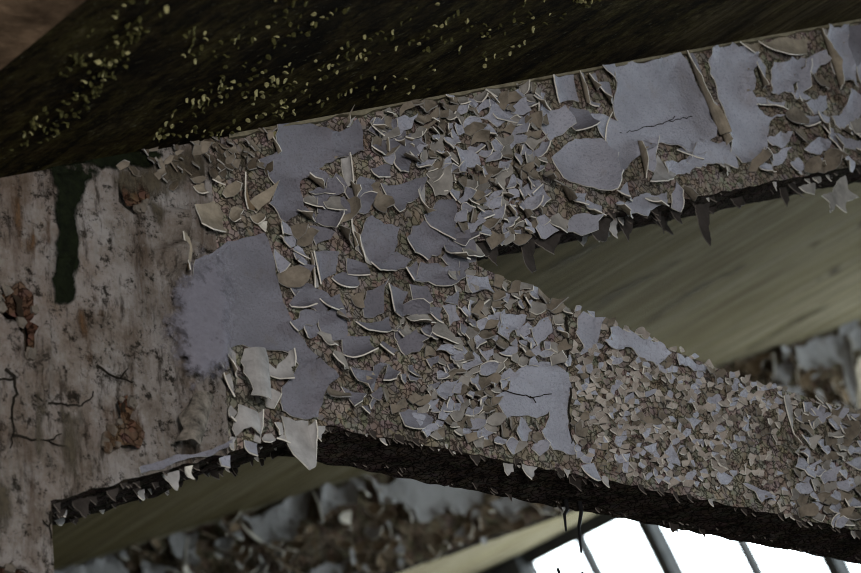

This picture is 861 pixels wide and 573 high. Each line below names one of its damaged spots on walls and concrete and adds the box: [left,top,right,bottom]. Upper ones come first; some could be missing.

crack [620,116,692,133]
water stain [114,149,245,224]
spalling [0,281,39,361]
peeling [100,24,861,539]
crack [0,368,94,448]
crack [96,364,132,383]
peeling [52,463,565,573]